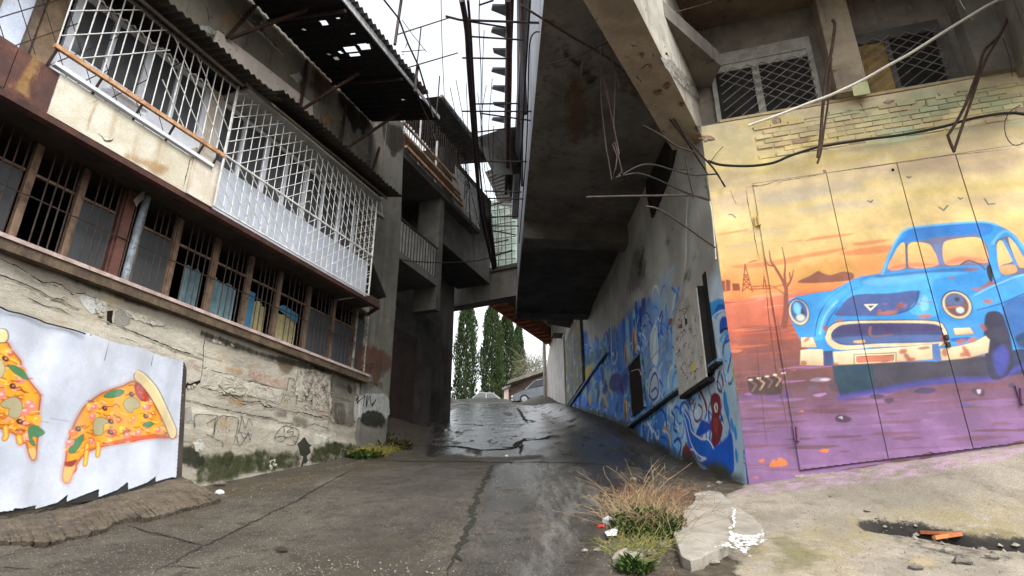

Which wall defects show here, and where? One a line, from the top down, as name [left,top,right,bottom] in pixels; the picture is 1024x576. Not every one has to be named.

peeling [79,294,167,327]
crack [0,259,355,430]
spalling [186,368,332,414]
peeling [193,439,205,453]
peeling [313,432,336,445]
damp [328,442,341,455]